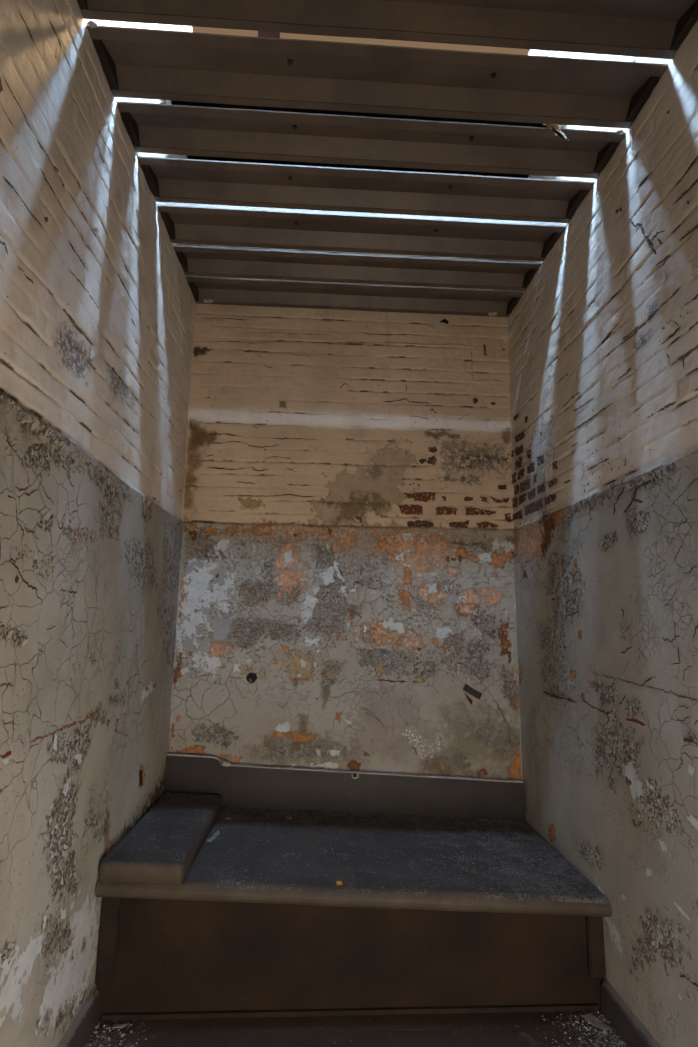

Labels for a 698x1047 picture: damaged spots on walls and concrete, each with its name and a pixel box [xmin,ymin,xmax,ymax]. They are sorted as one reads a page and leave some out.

crack [0,434,77,623]
crack [0,660,99,743]
leakage [184,424,216,507]
peeling [0,391,519,701]
leakage [322,493,391,522]
spalling [399,412,558,528]
peeling [537,544,590,709]
crack [543,479,698,745]
peeling [557,441,686,531]
peeling [591,679,698,851]
peeling [0,693,125,1046]
peeling [604,897,698,981]